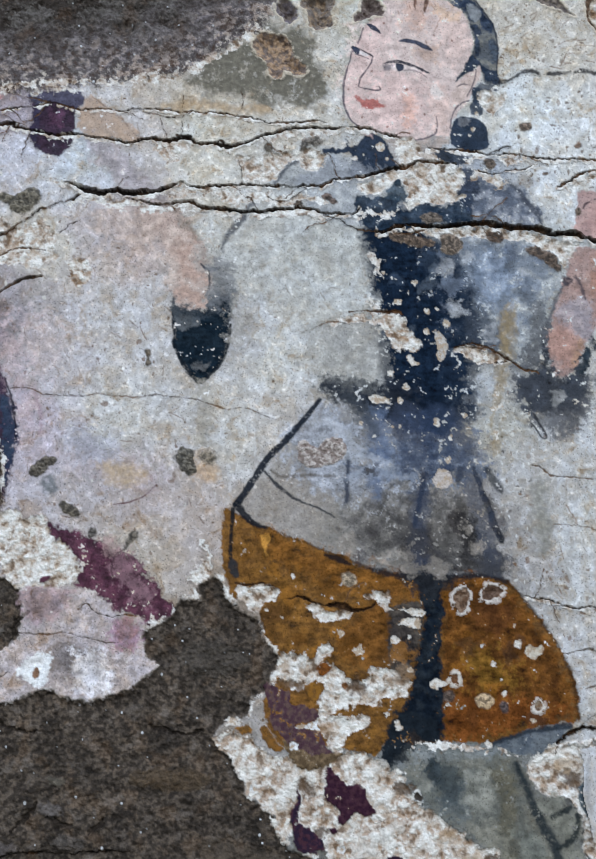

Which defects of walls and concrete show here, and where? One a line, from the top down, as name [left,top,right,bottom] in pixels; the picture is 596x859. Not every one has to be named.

spalling [527,0,596,33]
flaking render [0,0,388,100]
crack [0,89,596,293]
peeling [431,455,454,490]
flaking render [0,438,85,650]
crack [523,568,596,623]
peeling [513,639,545,660]
crack [566,647,596,655]
flaking render [0,539,508,859]
spalling [522,696,548,724]
crack [554,713,596,755]
flaking render [411,735,596,859]